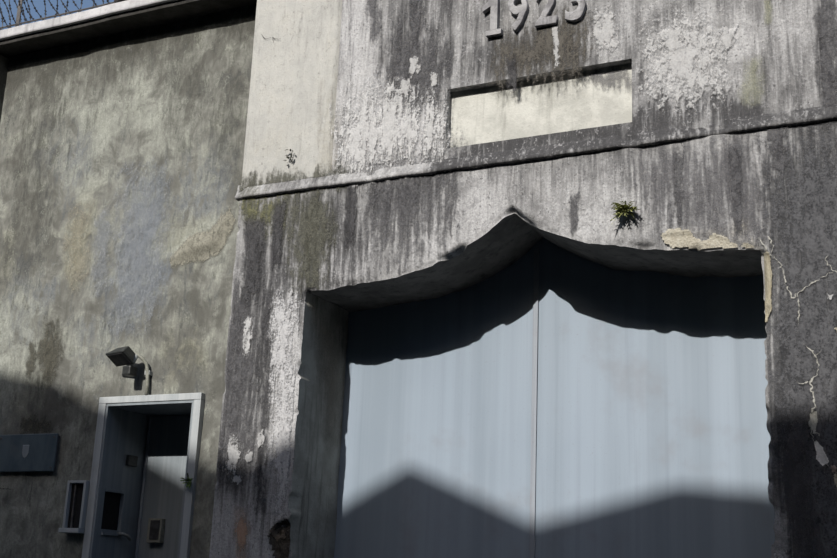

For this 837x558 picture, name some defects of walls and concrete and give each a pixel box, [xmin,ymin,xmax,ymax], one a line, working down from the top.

leakage [375,0,454,117]
leakage [813,0,837,108]
peeling [331,56,452,177]
leakage [219,136,467,526]
leakage [569,191,580,234]
spalling [661,228,755,250]
leakage [631,119,837,558]
spalling [763,252,772,322]
crack [760,236,837,324]
peeling [227,429,265,485]
spalling [808,411,837,487]
spalling [267,519,291,558]